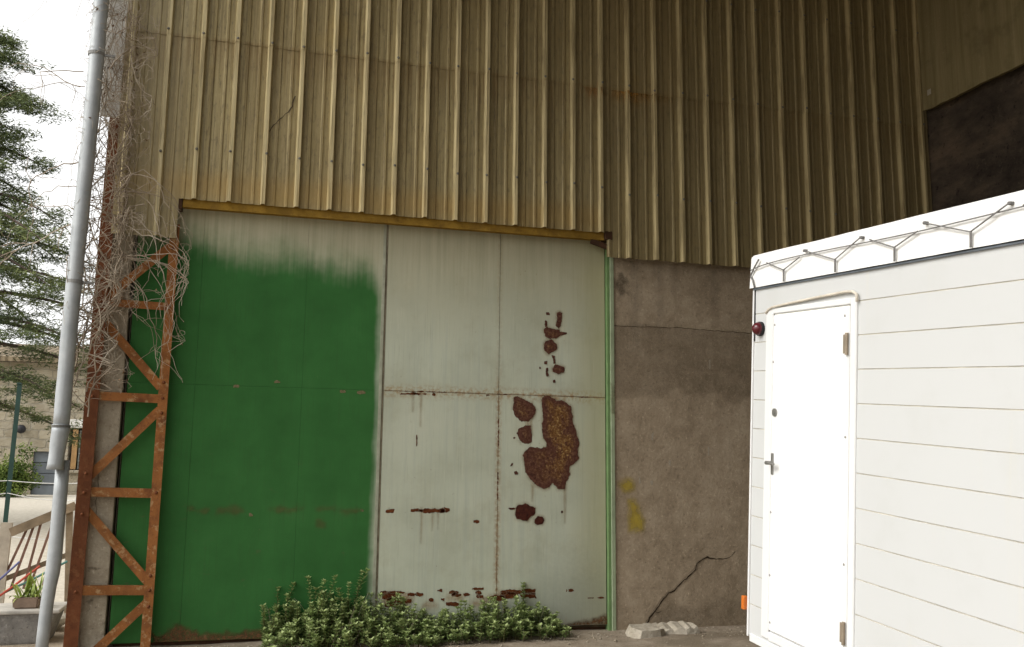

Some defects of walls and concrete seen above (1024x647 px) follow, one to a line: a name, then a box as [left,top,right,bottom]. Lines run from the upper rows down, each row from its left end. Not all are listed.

corrosion [539,312,567,383]
corrosion [486,394,579,489]
corrosion [508,503,544,525]
corrosion [380,587,536,607]
crack [645,552,735,623]